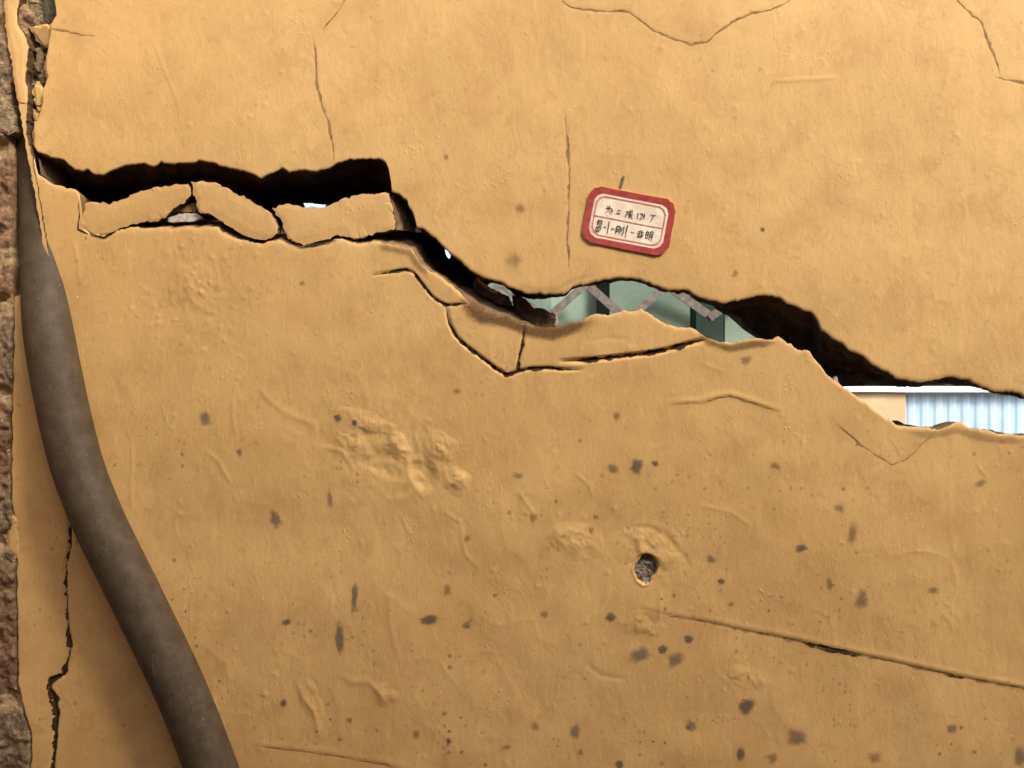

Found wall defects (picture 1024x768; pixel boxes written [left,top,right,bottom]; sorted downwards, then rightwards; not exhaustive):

spalling [0,0,56,256]
crack [35,0,1024,399]
crack [834,420,1024,465]
spalling [5,514,21,559]
spalling [631,554,661,588]
crack [46,525,73,768]
crack [645,609,1024,689]